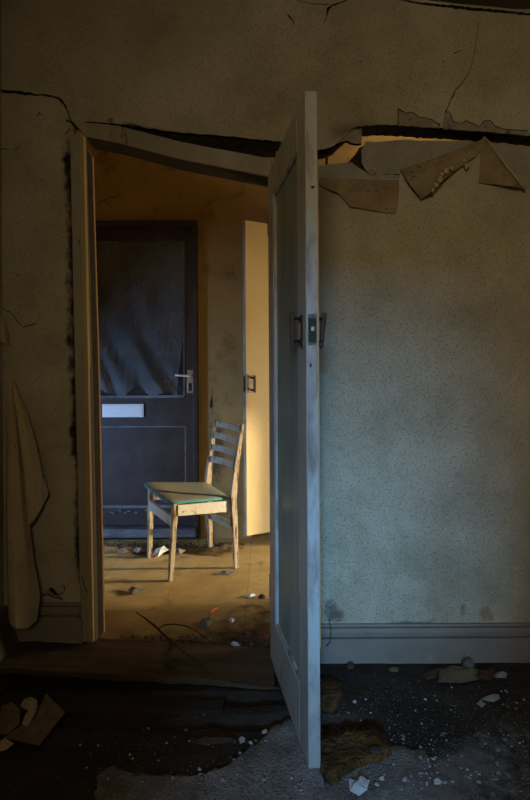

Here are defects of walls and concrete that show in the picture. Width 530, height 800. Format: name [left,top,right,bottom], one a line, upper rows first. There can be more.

crack [287,0,347,25]
crack [403,0,530,112]
crack [1,89,82,135]
spalling [397,108,529,136]
leakage [63,143,80,579]